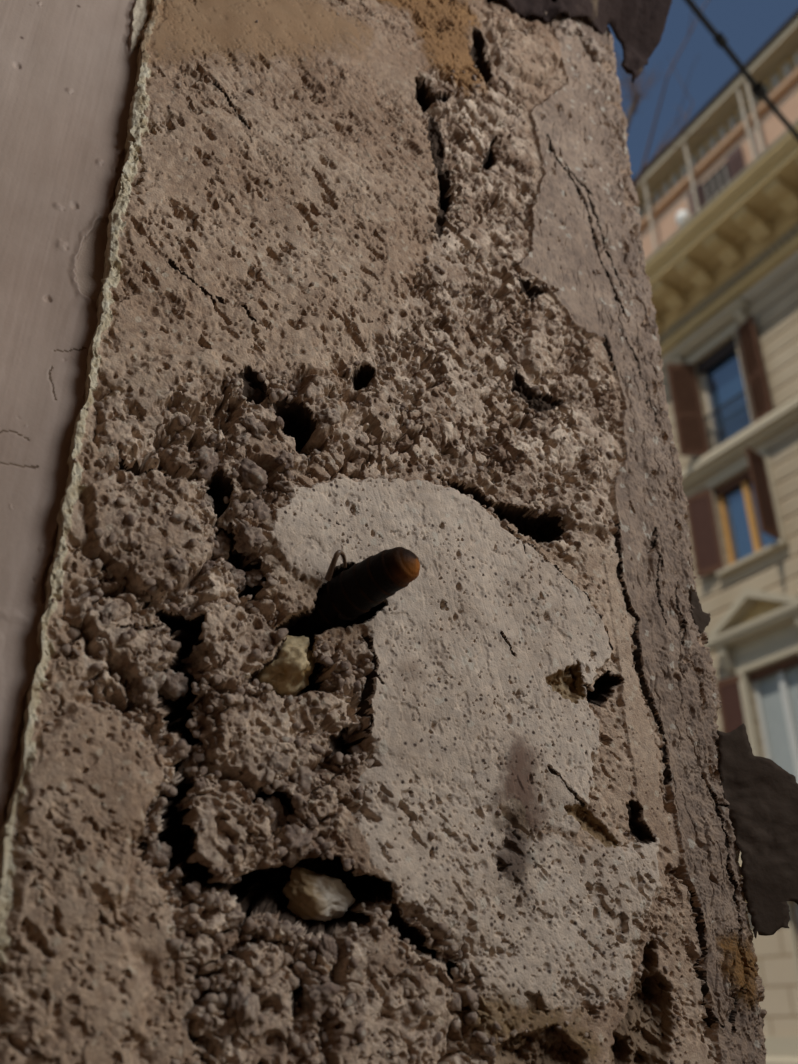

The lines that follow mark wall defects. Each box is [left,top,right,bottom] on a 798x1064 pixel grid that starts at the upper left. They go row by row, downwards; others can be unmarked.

peeling [130,0,152,52]
flaking render [499,0,672,83]
spalling [40,28,624,1064]
crack [355,634,384,734]
crack [483,506,687,785]
peeling [5,697,26,819]
crack [547,766,586,808]
spalling [626,800,657,844]
crack [701,774,743,958]
crack [689,890,747,1035]